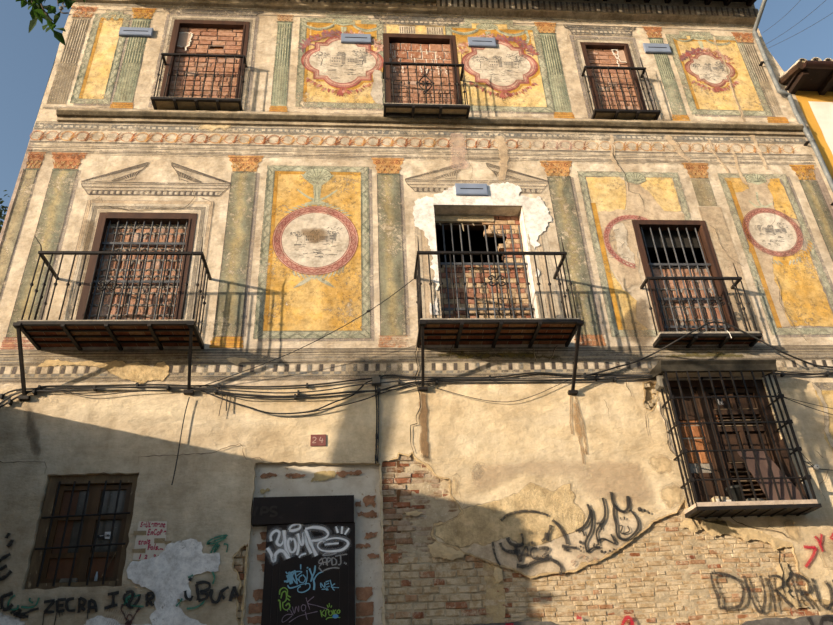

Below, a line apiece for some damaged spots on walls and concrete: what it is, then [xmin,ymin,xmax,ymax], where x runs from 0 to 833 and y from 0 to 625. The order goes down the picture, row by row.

peeling [38,359,169,383]
crack [142,444,261,459]
peeling [260,470,362,482]
corrosion [419,393,429,460]
corrosion [570,395,587,464]
spalling [355,452,833,625]